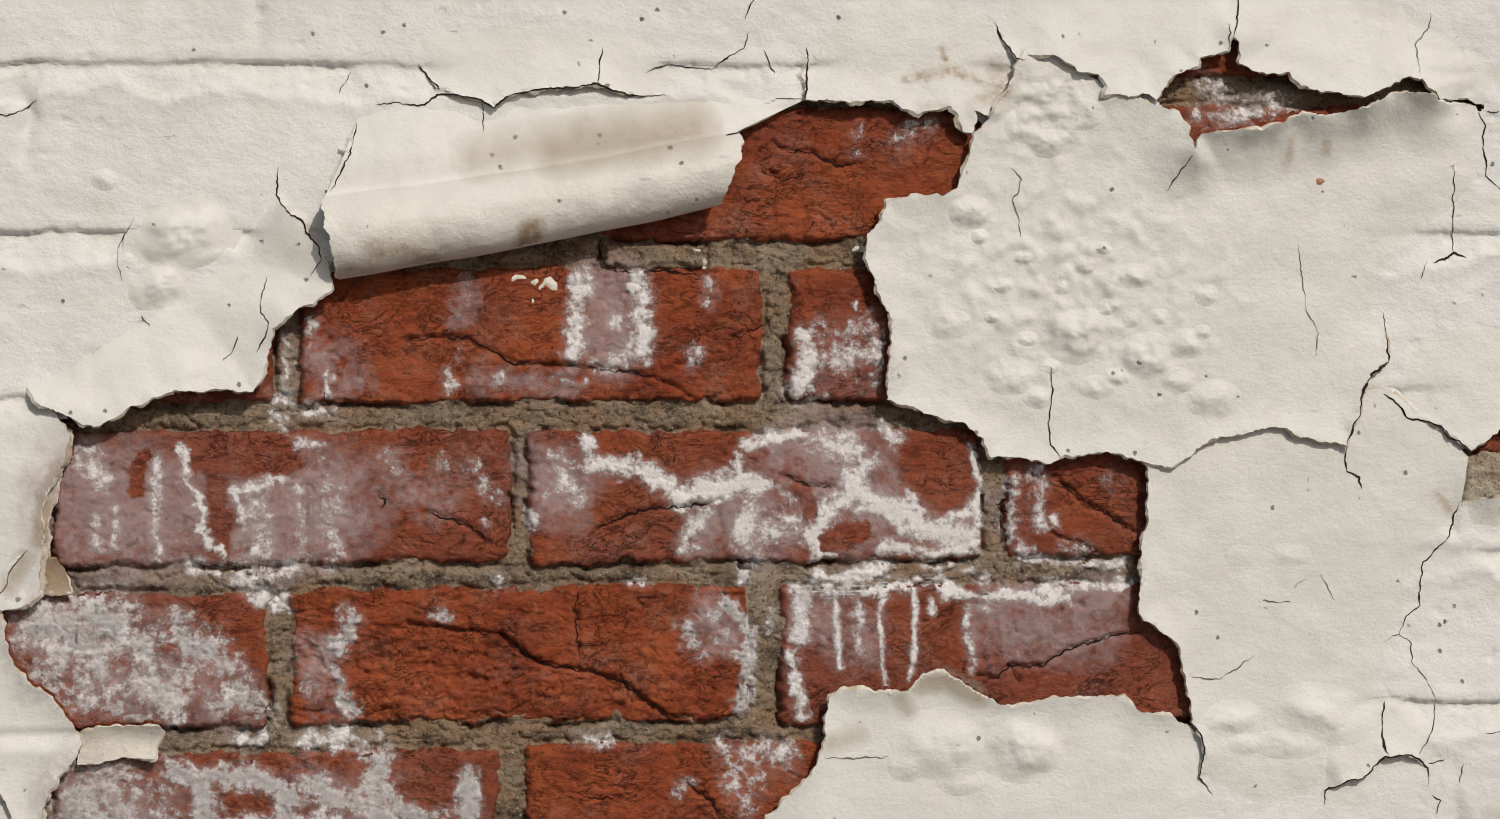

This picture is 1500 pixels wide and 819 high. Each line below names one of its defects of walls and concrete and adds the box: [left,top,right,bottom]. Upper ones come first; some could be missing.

efflorescence [2,583,482,819]
peeling [0,97,803,819]
crack [276,0,809,275]
peeling [421,24,680,101]
efflorescence [582,732,615,748]
efflorescence [525,418,1145,722]
peeling [765,0,1500,819]
crack [1194,725,1213,792]
crack [1299,254,1319,356]
crack [1321,500,1463,813]
crack [1344,316,1474,488]
crack [1421,111,1500,278]